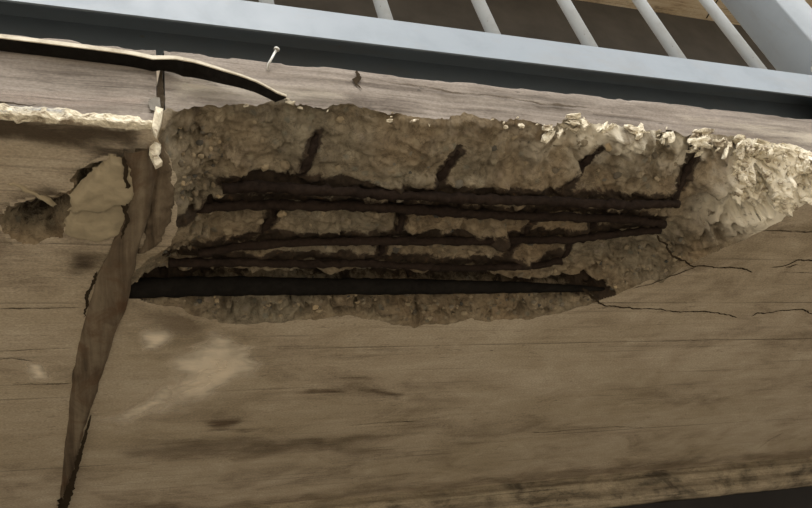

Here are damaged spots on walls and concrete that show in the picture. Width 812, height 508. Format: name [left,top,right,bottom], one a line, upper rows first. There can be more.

crack [120,157,131,239]
spalling [0,97,812,328]
crack [7,272,97,317]
crack [636,235,751,288]
crack [582,288,812,318]
crack [57,415,91,508]